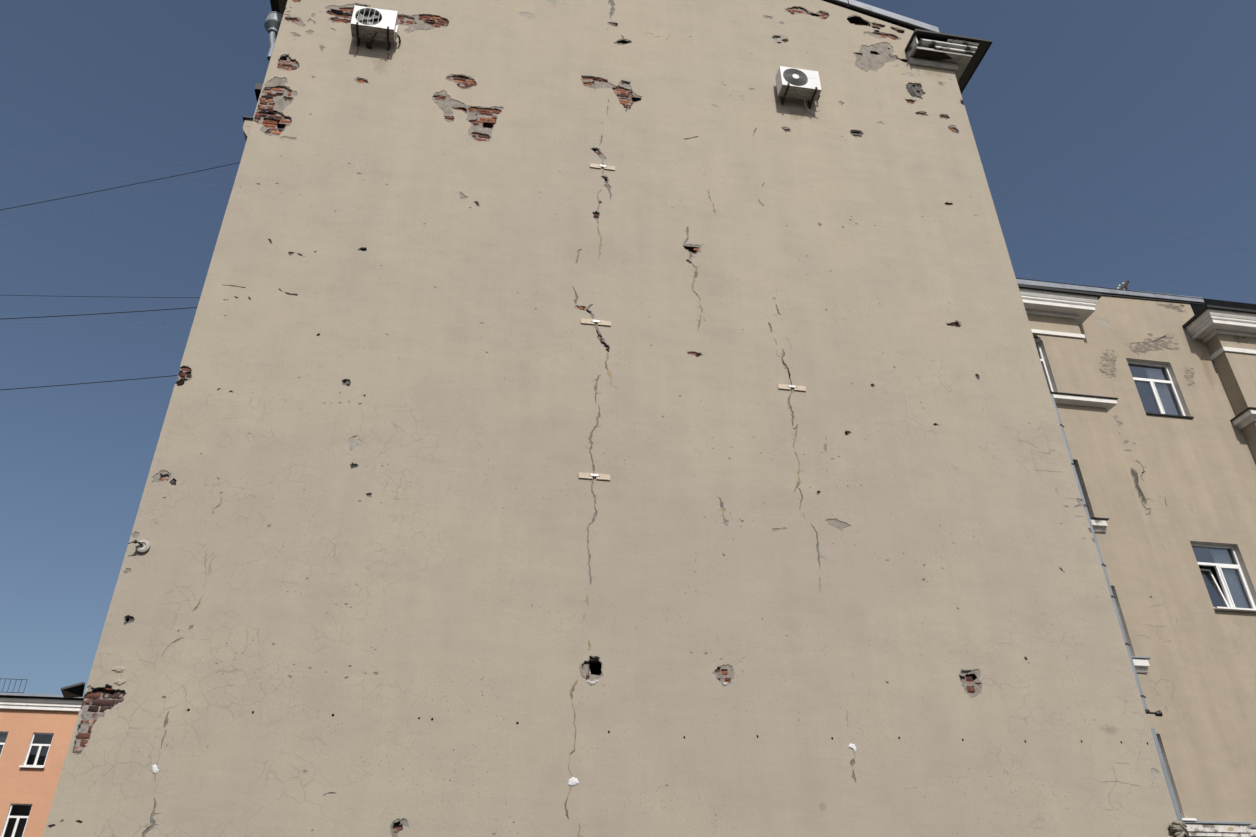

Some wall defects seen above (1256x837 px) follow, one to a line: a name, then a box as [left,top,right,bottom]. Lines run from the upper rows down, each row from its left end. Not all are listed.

spalling [253,54,300,140]
spalling [432,74,504,142]
spalling [581,75,642,110]
peeling [846,15,959,134]
crack [572,100,627,310]
crack [684,227,705,329]
crack [583,353,618,651]
crack [768,297,822,593]
spalling [71,684,127,756]
crack [142,711,169,837]
crack [564,680,583,837]
spalling [579,656,603,681]